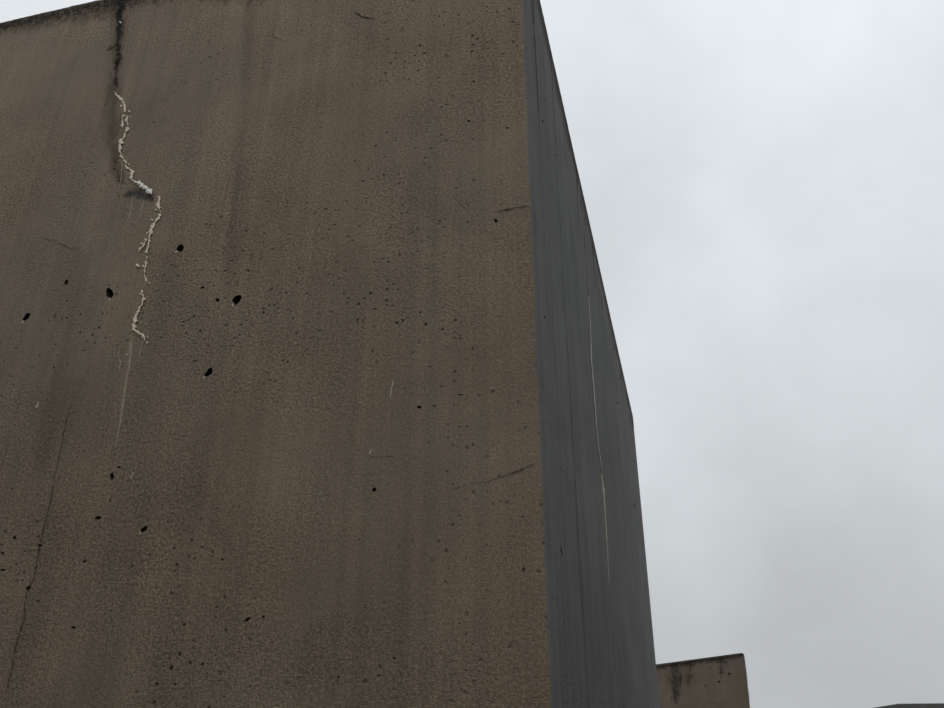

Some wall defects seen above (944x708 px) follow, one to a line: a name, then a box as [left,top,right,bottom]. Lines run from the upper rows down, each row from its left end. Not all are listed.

crack [115,92,161,355]
crack [501,44,619,707]